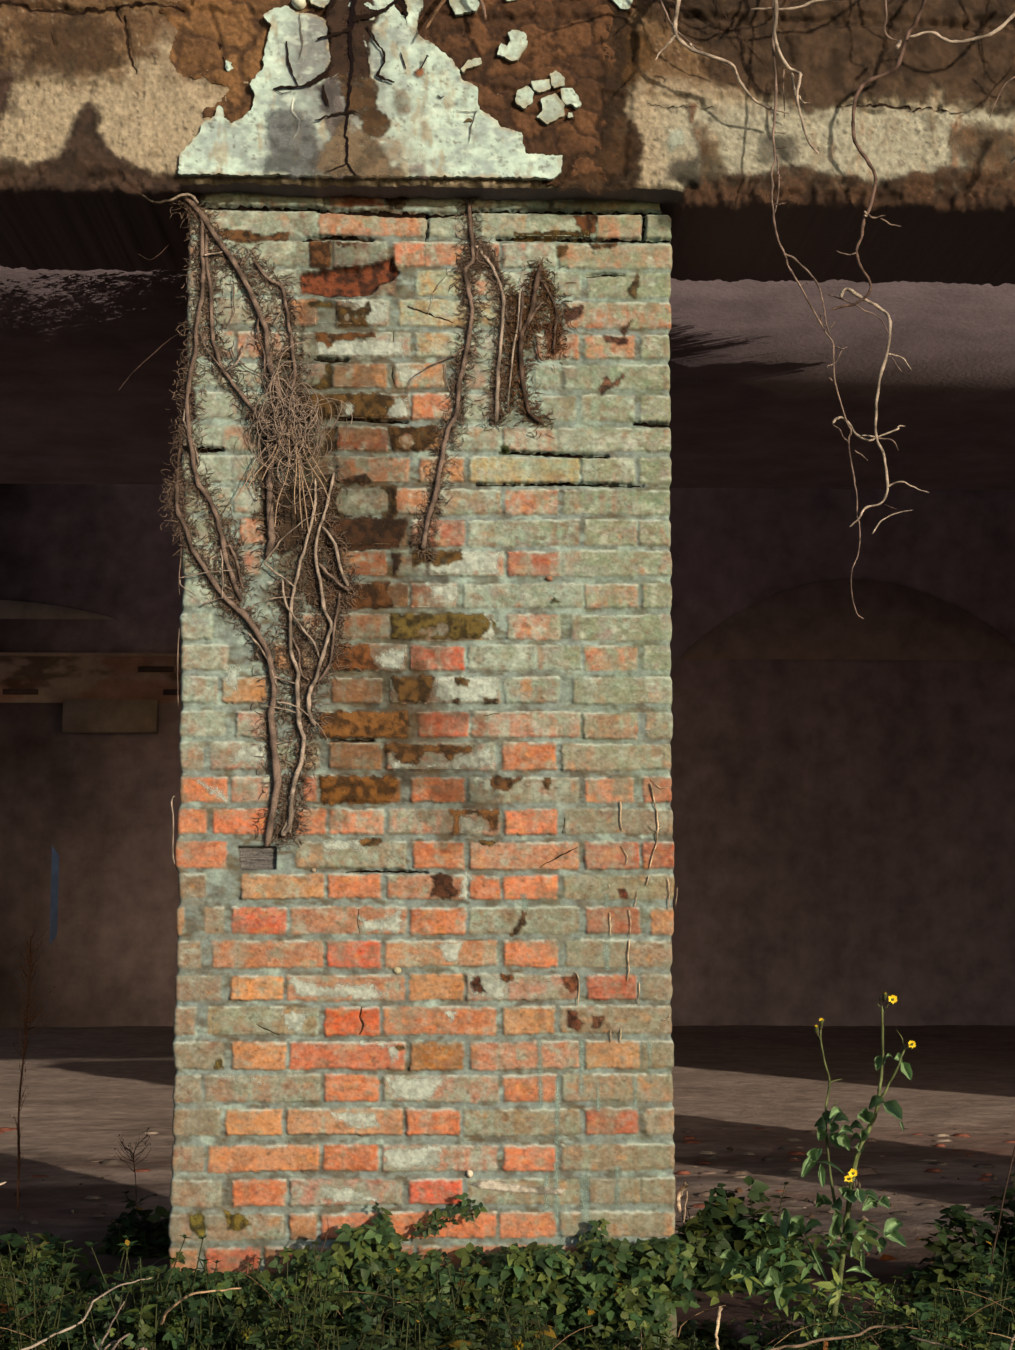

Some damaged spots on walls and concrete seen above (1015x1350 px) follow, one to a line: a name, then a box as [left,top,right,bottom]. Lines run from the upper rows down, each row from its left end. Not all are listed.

crack [0,0,186,74]
crack [273,0,408,176]
peeling [159,0,637,187]
leakage [216,228,290,243]
leakage [514,215,617,257]
spalling [300,260,398,297]
leakage [269,299,439,453]
leakage [263,473,523,805]
leakage [449,808,499,846]
leakage [290,977,383,1001]
leakage [385,1076,442,1099]
leakage [384,1145,442,1169]